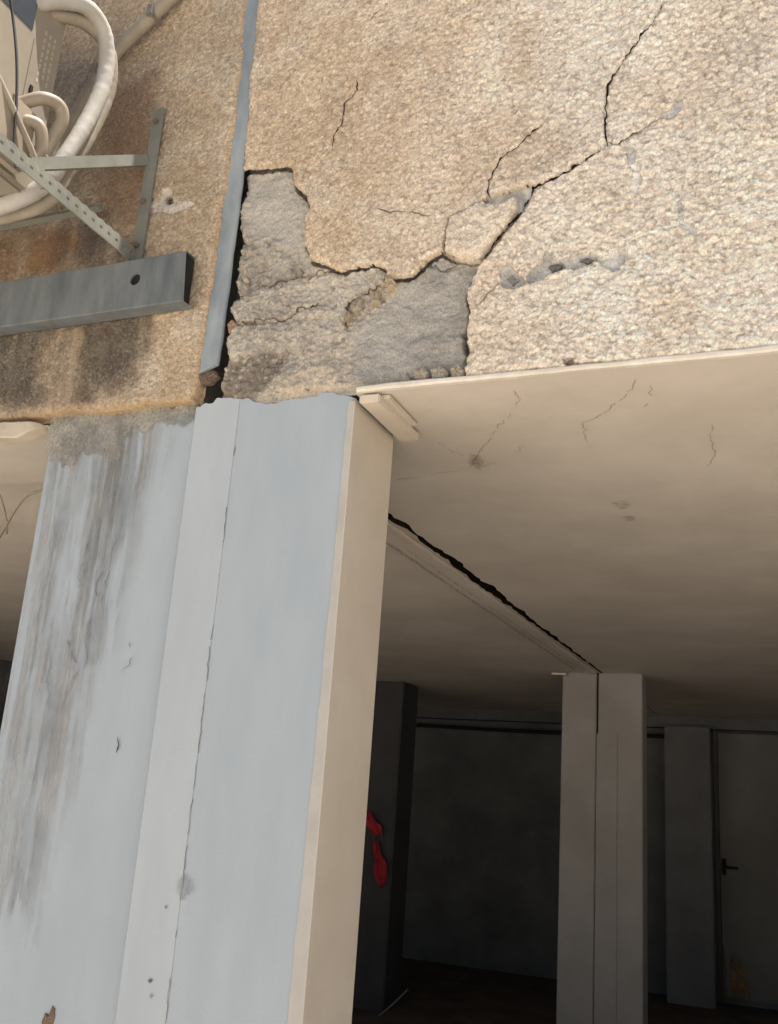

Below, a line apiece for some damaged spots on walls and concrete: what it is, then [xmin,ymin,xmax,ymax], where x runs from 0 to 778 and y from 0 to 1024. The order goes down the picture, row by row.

crack [332,81,358,149]
crack [485,5,663,257]
flaking render [484,187,535,216]
flaking render [199,167,478,404]
peeling [45,404,196,467]
crack [582,380,652,442]
crack [386,543,576,669]